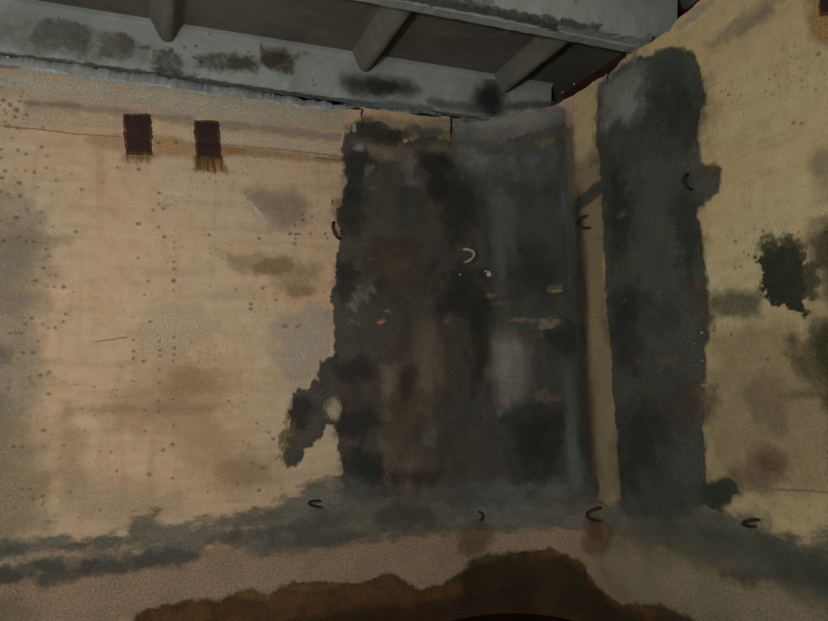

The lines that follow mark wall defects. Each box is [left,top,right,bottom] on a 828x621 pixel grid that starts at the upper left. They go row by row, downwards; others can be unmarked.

mould [402,0,601,32]
leakage [0,22,331,101]
leakage [0,64,342,126]
leakage [346,101,432,116]
rust [154,137,341,173]
leakage [0,106,828,600]
leakage [135,548,693,621]